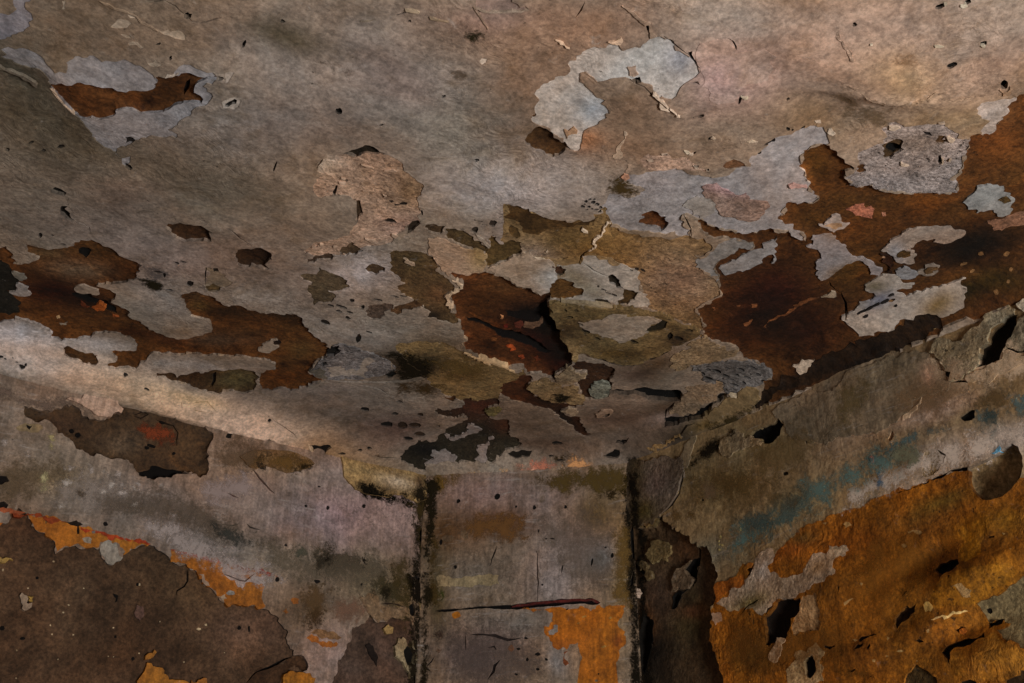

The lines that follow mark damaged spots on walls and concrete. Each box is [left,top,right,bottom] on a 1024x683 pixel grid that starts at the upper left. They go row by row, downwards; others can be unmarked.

flaking render [0,0,241,170]
peeling [525,36,777,157]
flaking render [0,80,1024,480]
flaking render [0,501,316,683]
damp [77,435,457,683]
damp [538,455,654,683]
flaking render [626,434,849,683]